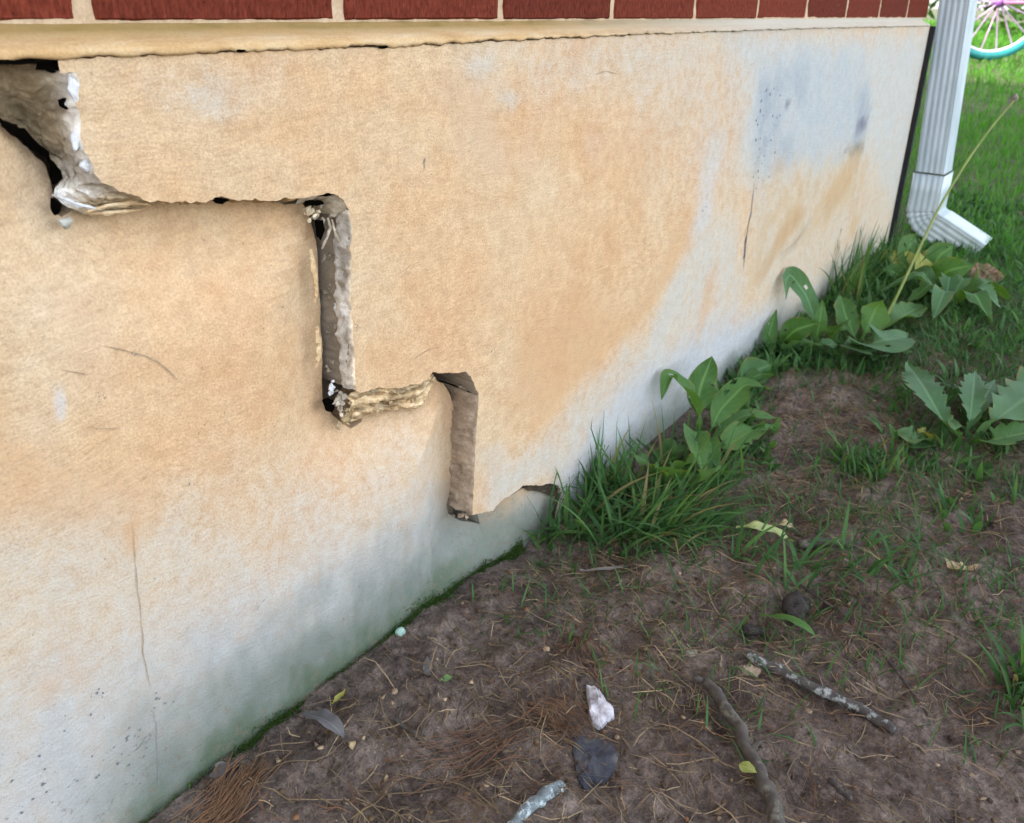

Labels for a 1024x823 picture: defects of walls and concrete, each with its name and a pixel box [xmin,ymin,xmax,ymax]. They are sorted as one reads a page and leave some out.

crack [0,56,117,65]
damp [123,53,295,142]
crack [309,34,630,50]
crack [743,180,756,269]
damp [390,27,929,576]
crack [100,345,179,381]
crack [143,193,485,519]
crack [522,483,561,519]
crack [131,521,159,782]